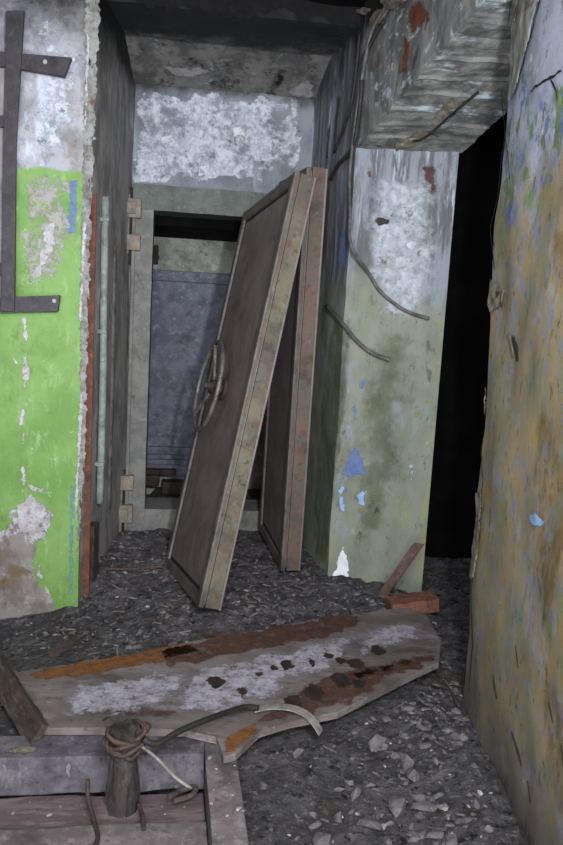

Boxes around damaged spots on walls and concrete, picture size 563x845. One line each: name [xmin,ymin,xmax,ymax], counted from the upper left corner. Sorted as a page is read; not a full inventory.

rust [401,1,430,73]
spalling [19,0,101,603]
peeling [343,448,366,477]
peeling [0,466,56,620]